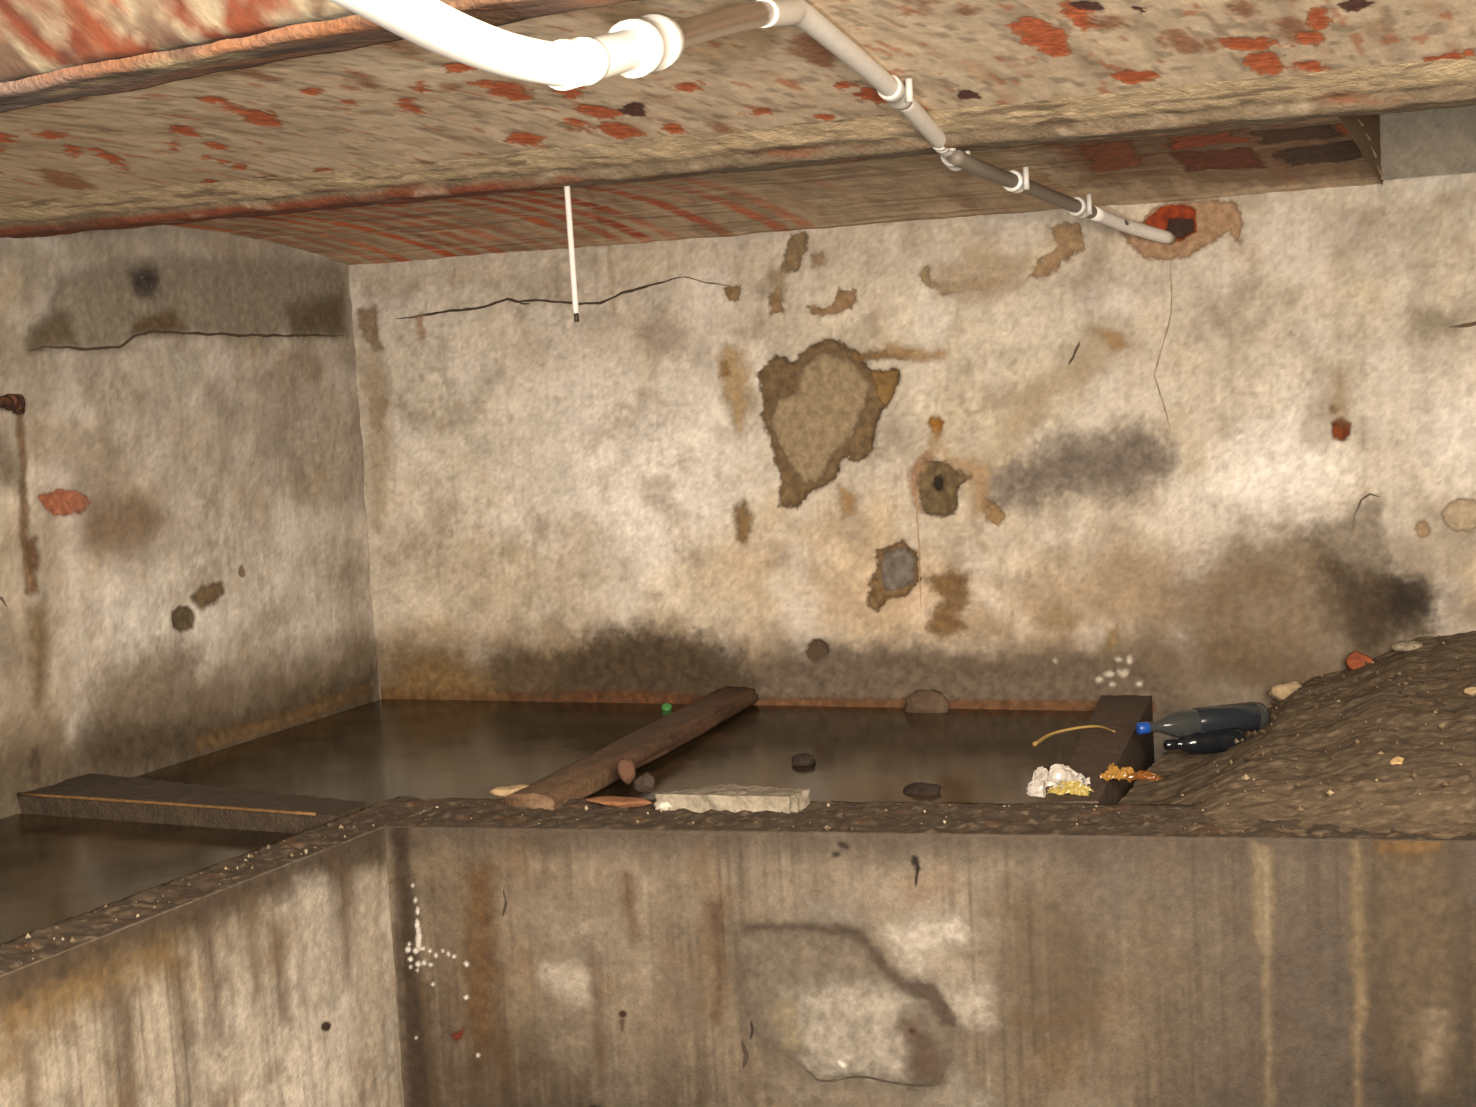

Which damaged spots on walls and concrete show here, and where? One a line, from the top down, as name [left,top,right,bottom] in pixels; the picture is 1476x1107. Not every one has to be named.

crack [397,276,730,338]
crack [1417,313,1476,330]
peeling [28,262,388,520]
spalling [758,339,911,508]
corrosion [0,414,38,594]
spalling [910,452,972,517]
spalling [867,540,921,612]
water stain [928,571,968,635]
corrosion [30,610,45,702]
water stain [392,629,1170,714]
water stain [0,827,439,1107]
water stain [887,915,969,975]